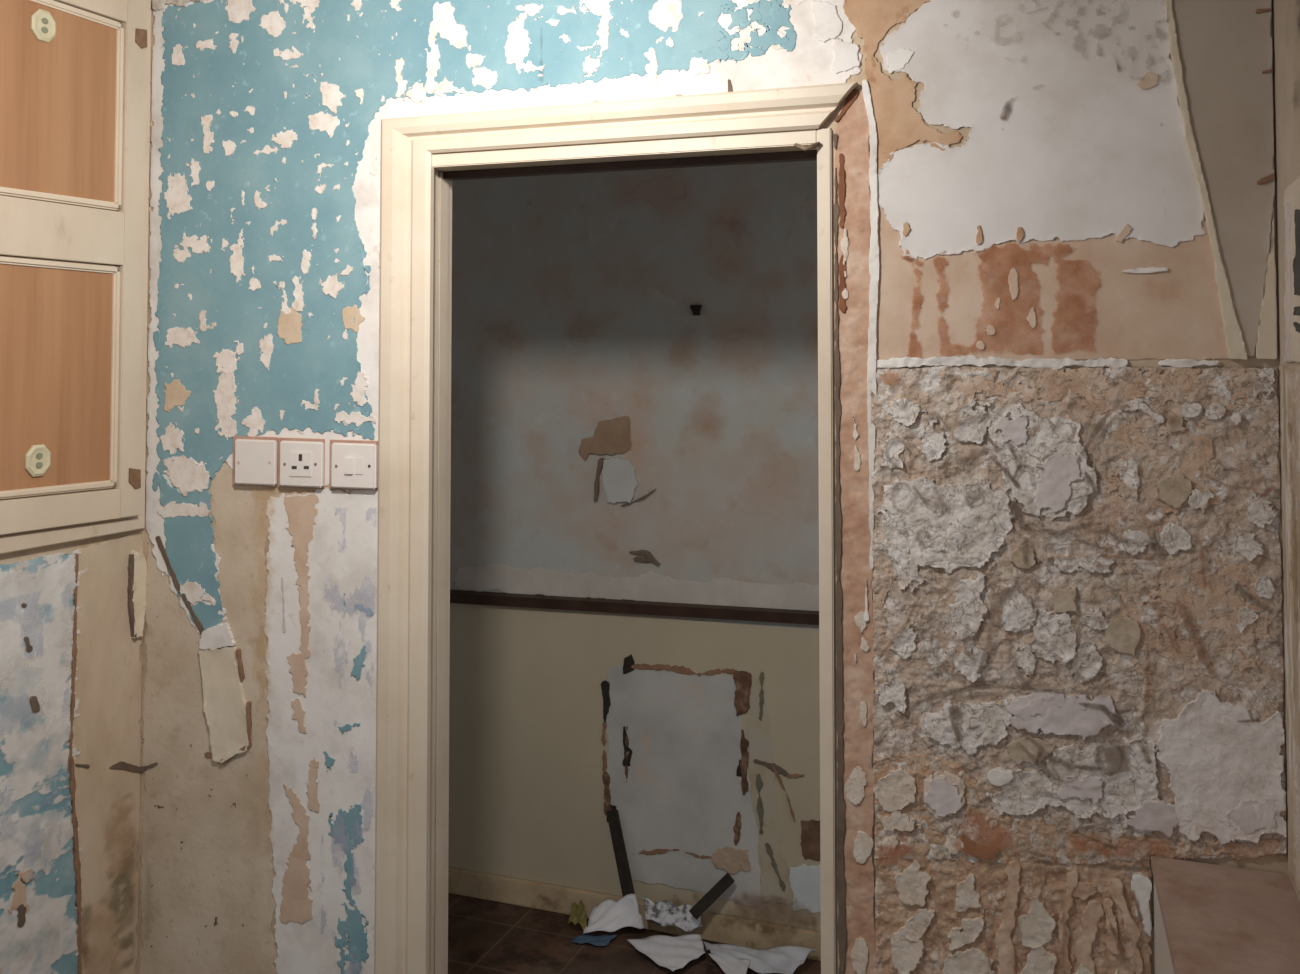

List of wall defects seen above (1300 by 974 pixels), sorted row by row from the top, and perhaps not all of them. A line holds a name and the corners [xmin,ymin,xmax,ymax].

flaking render [877,204,1229,361]
peeling [0,0,962,974]
crack [878,404,1286,789]
leakage [81,806,134,974]